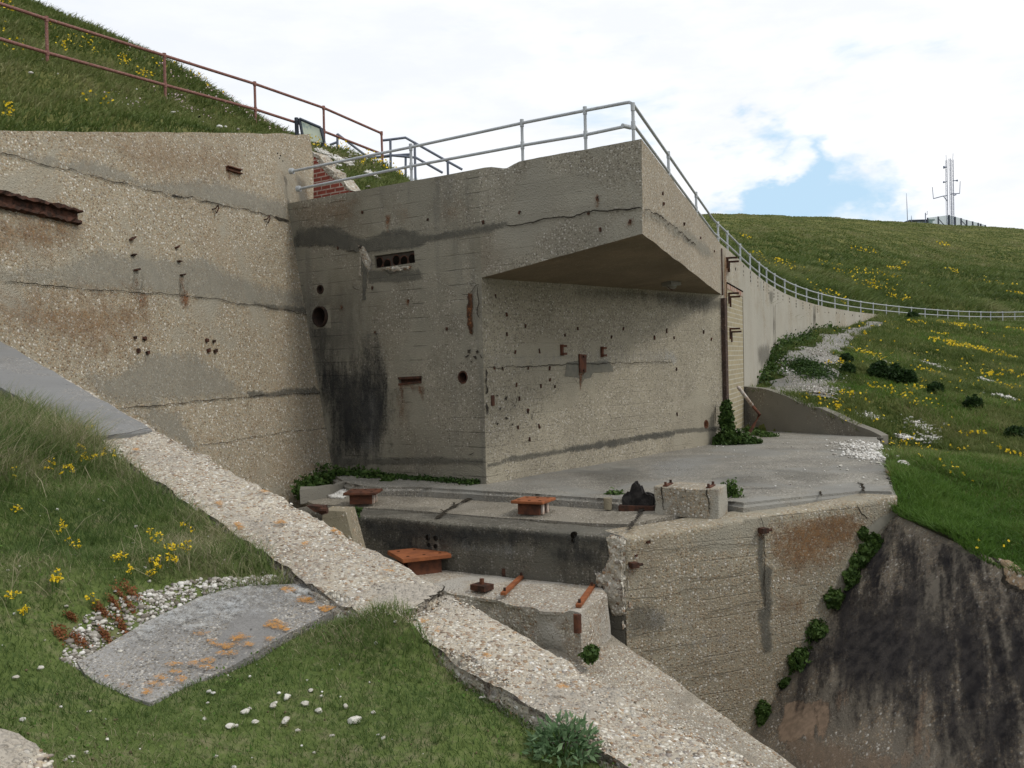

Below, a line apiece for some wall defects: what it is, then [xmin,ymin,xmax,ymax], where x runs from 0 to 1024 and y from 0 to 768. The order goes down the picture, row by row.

crack [2,152,289,222]
crack [507,207,696,245]
crack [4,275,307,315]
damp [294,223,506,300]
damp [248,359,386,451]
spalling [595,509,644,630]
rust [758,514,859,575]
damp [865,525,919,587]
damp [989,592,1024,736]